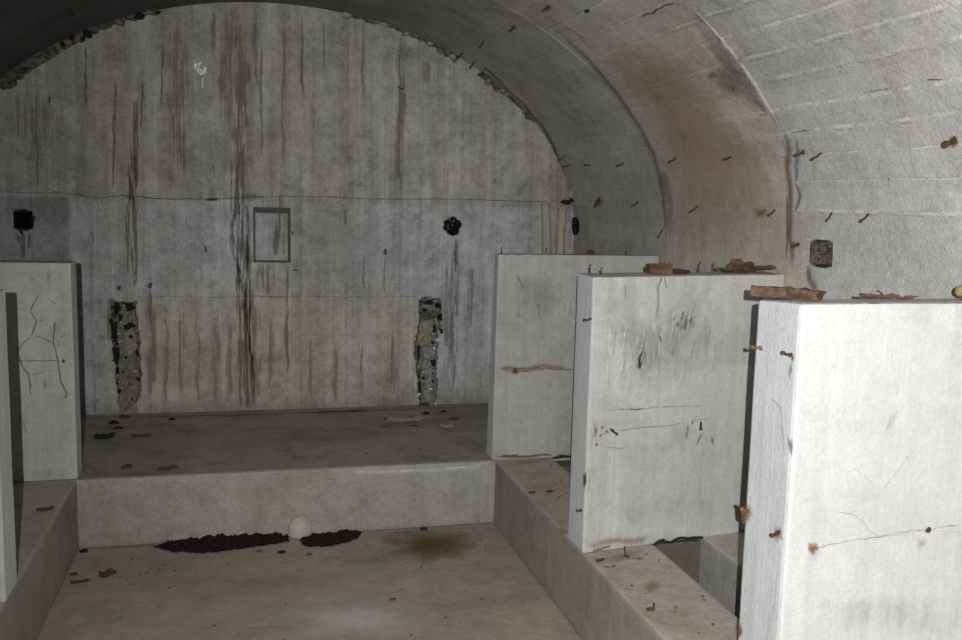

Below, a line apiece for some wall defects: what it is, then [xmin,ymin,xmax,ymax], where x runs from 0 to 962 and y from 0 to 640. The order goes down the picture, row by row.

water stain [126,84,143,284]
water stain [213,28,269,404]
water stain [273,196,285,254]
crack [15,275,67,403]
spalling [107,299,143,413]
water stain [269,273,402,387]
spalling [414,297,443,404]